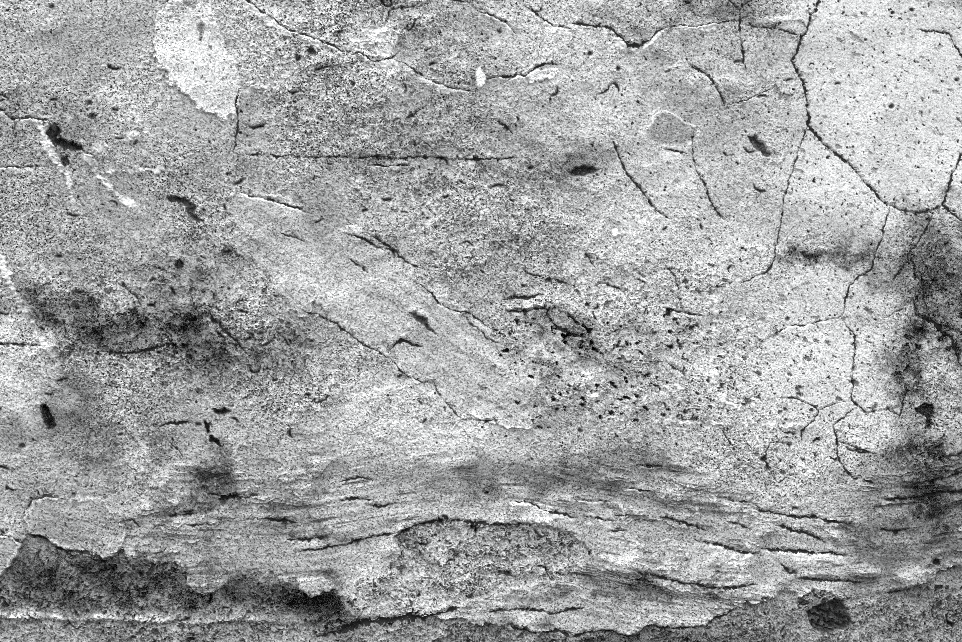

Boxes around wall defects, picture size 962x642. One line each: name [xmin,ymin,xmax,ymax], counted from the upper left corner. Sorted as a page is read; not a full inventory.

crack [246,0,558,91]
crack [0,108,57,125]
crack [234,92,516,167]
crack [241,192,304,212]
crack [525,0,962,483]
crack [348,234,497,343]
crack [508,278,586,338]
flaking render [57,421,962,642]